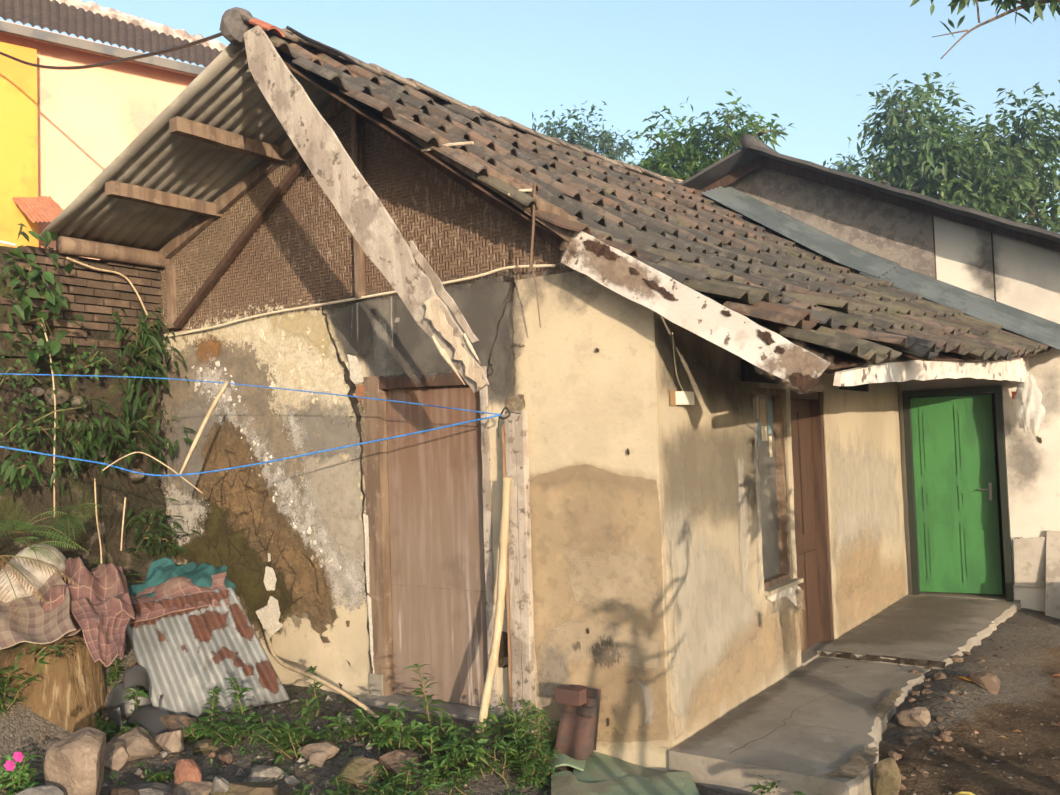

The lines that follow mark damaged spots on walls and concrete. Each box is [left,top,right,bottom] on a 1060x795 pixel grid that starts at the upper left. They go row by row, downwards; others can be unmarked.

flaking render [160,300,366,643]
crack [322,306,373,673]
flaking render [363,513,375,674]
leakage [530,327,831,748]
leakage [1012,430,1039,480]